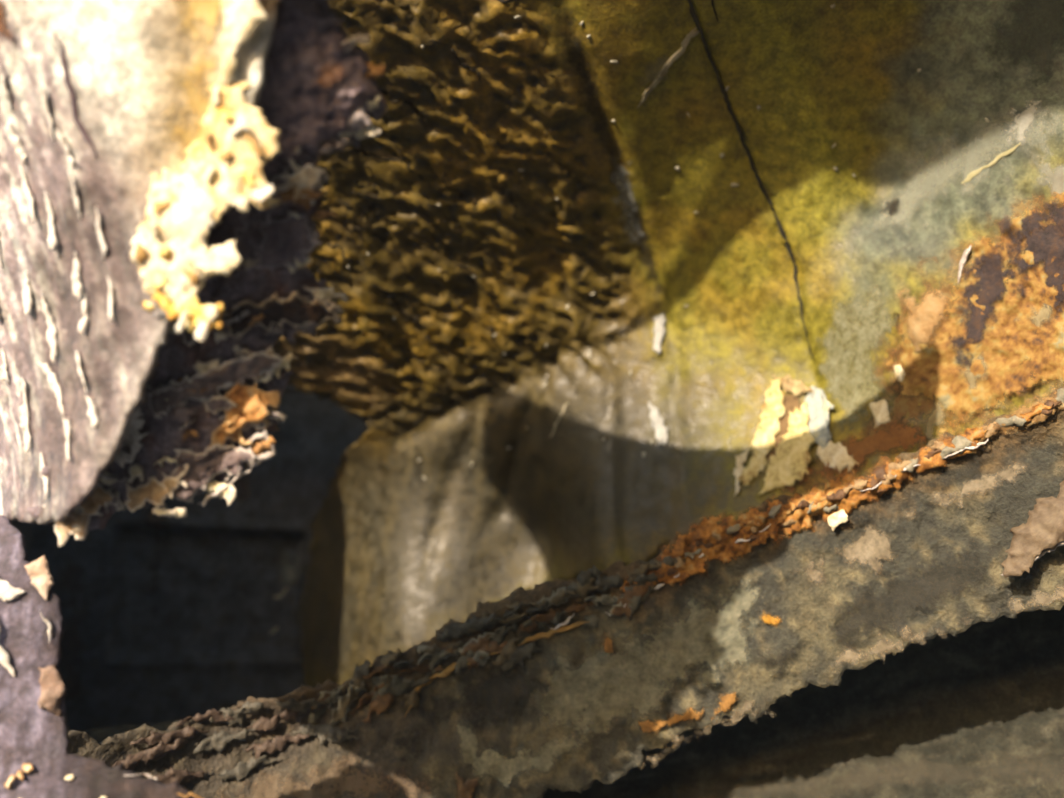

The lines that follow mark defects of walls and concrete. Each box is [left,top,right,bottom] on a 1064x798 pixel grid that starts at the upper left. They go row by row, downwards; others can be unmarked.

corrosion [169,0,221,147]
crack [564,14,662,292]
crack [687,0,814,360]
damp [874,101,1064,228]
peeling [53,0,348,546]
peeling [22,271,71,461]
peeling [733,374,859,496]
corrosion [619,192,1064,607]
peeling [0,555,54,643]
peeling [38,665,66,717]
corrosion [762,614,781,625]
peeling [1001,481,1064,578]